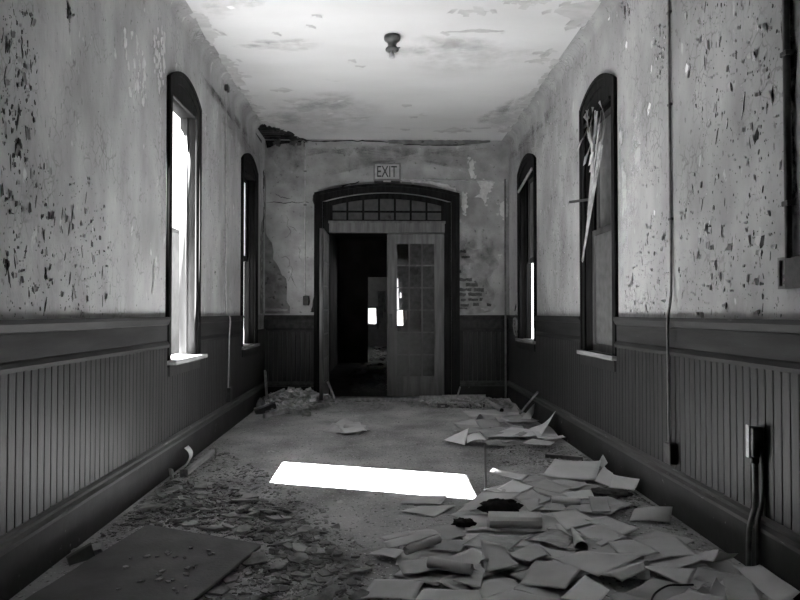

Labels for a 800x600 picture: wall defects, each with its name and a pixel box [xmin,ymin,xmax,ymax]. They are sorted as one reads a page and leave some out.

peeling [448,0,601,31]
peeling [123,27,166,107]
peeling [219,54,308,147]
peeling [1,9,112,317]
peeling [400,157,508,220]
peeling [678,0,784,318]
spalling [258,177,292,329]